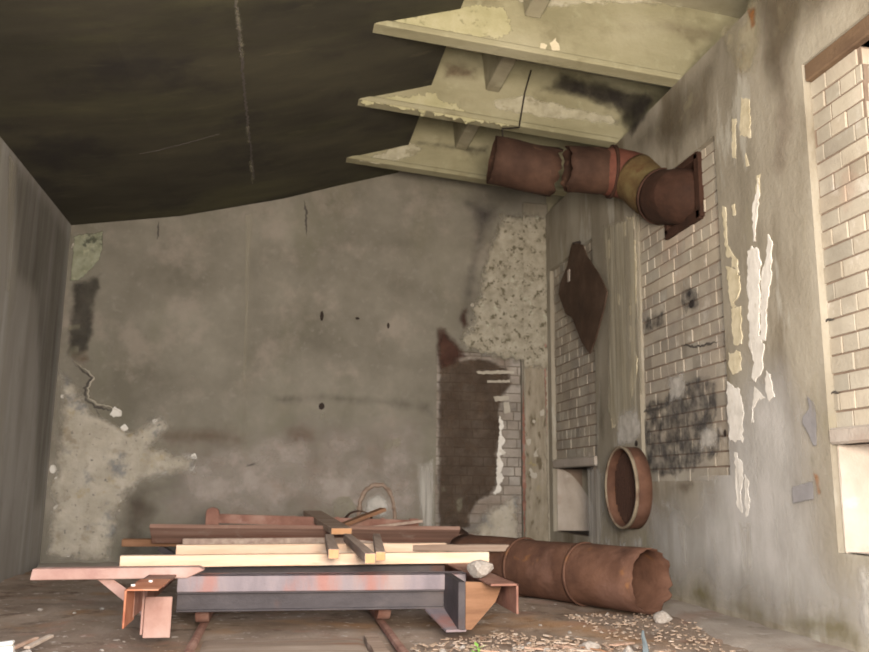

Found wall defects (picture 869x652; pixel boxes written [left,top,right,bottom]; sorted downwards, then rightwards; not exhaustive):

peeling [395,4,513,40]
damp [765,0,814,60]
crack [234,0,255,180]
peeling [360,142,421,164]
peeling [361,92,509,127]
peeling [731,97,751,167]
damp [70,279,98,359]
crack [72,361,122,419]
flaking render [461,213,549,541]
damp [604,216,823,598]
peeling [722,174,775,517]
flaking render [48,374,197,561]